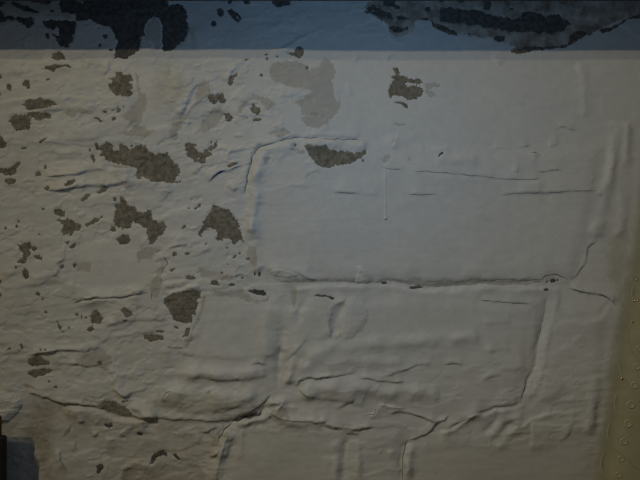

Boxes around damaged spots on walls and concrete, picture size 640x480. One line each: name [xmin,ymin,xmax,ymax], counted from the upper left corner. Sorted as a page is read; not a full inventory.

flaking render [0,1,190,60]
peeling [365,1,640,51]
flaking render [388,67,424,108]
flaking render [89,141,182,184]
crack [244,137,359,193]
flaking render [294,143,366,168]
flaking render [110,196,167,245]
flaking render [198,205,244,249]
crack [422,243,616,305]
flaking render [163,289,202,338]
crack [297,366,414,398]
crack [187,374,529,480]